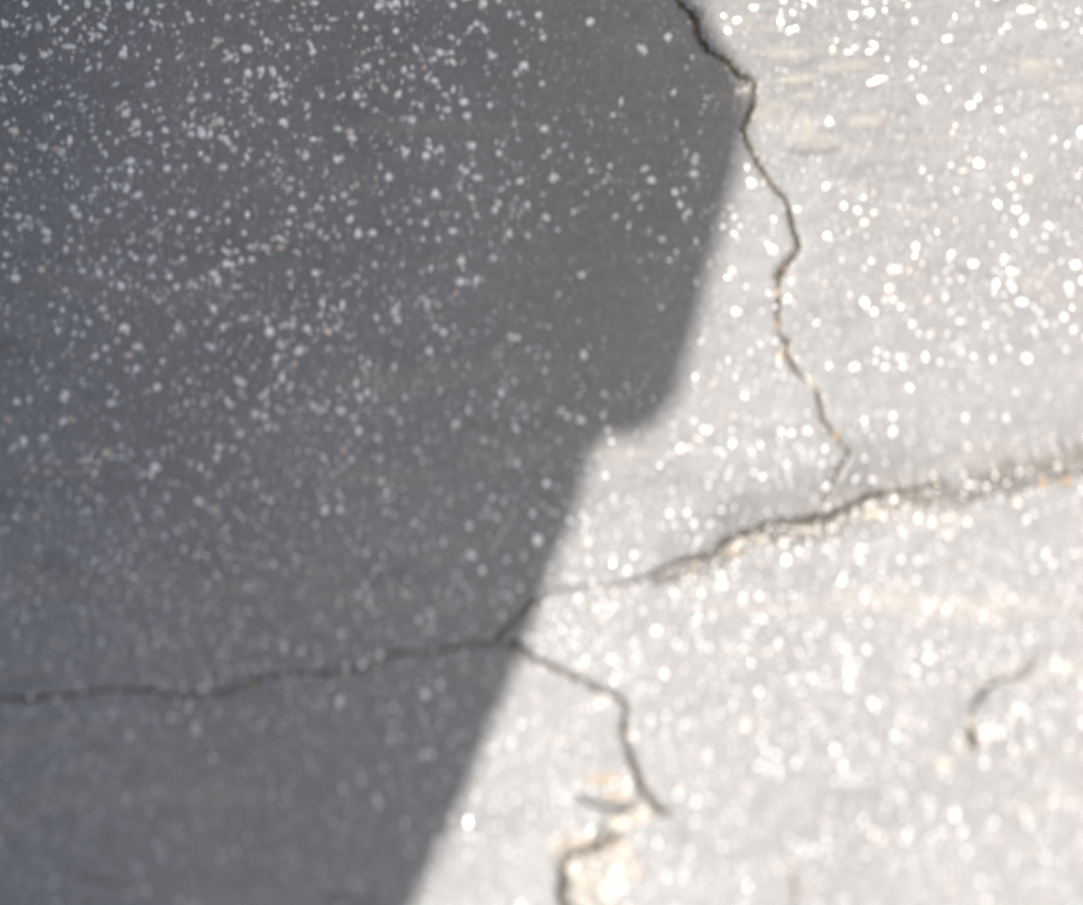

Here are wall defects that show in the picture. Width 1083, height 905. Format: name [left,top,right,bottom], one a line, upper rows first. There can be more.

crack [675,0,852,509]
crack [0,447,1083,817]